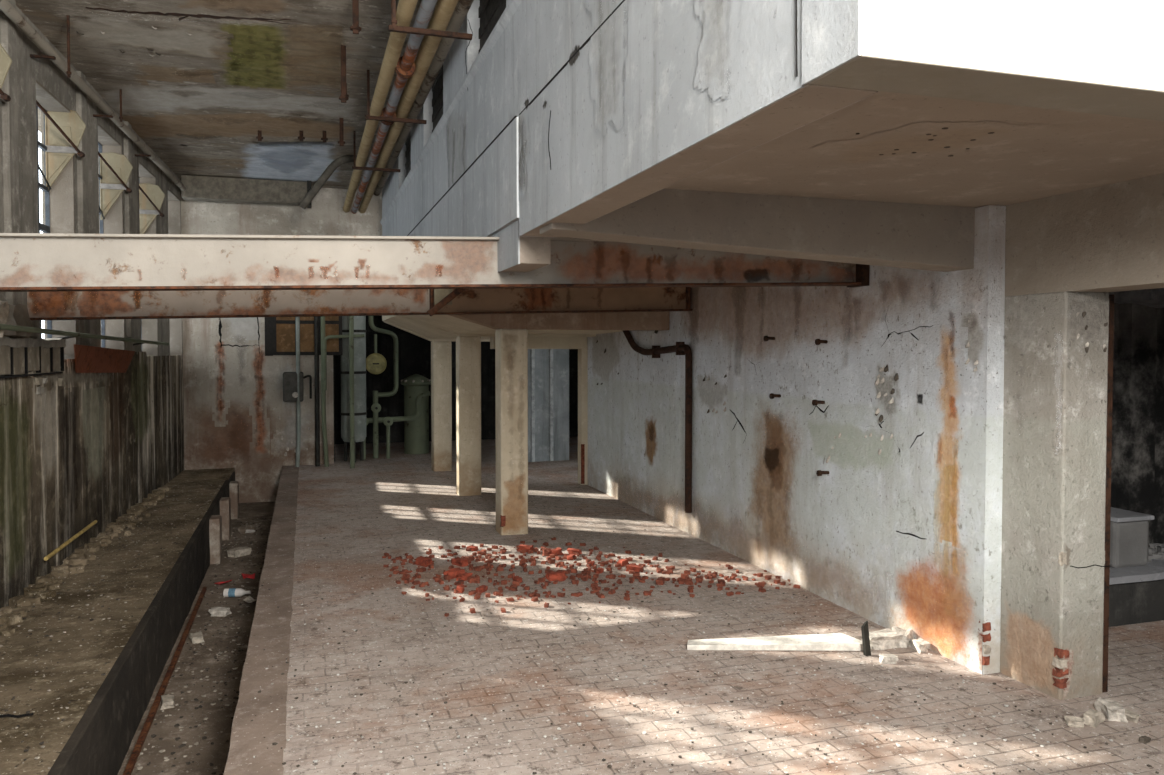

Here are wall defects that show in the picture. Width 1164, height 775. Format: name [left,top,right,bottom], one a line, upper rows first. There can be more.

rust [0,261,149,318]
rust [181,241,502,313]
rust [211,336,230,427]
rust [248,340,270,458]
rust [643,412,660,471]
rust [931,321,968,549]